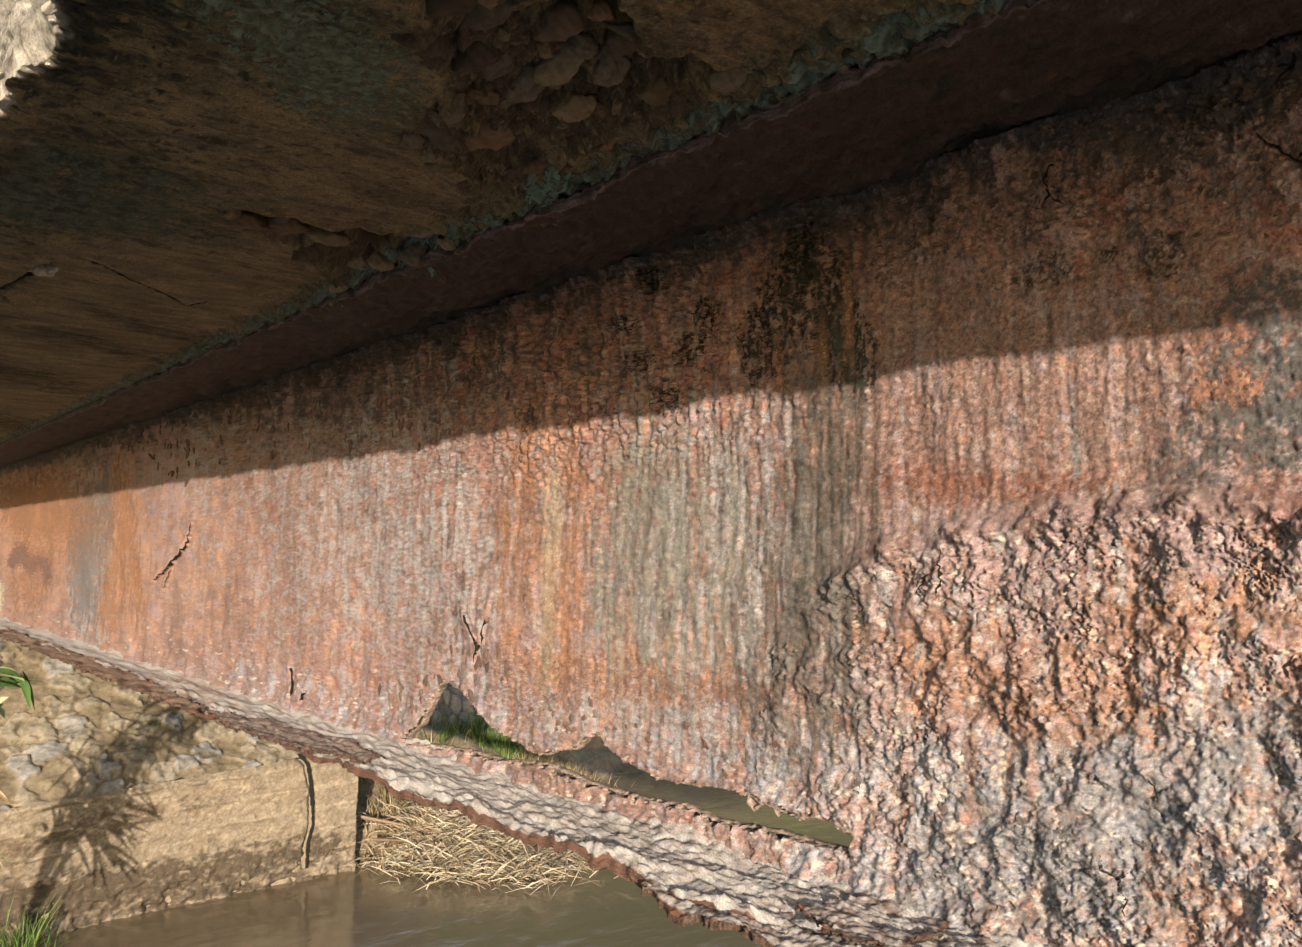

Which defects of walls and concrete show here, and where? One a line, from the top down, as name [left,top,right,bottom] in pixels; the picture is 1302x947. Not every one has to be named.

water stain [39,0,164,92]
spalling [391,0,689,202]
crack [1256,133,1302,163]
crack [0,257,230,316]
water stain [737,221,880,405]
rust [1184,322,1266,416]
crack [153,523,191,589]
rust [378,604,509,719]
rust [701,709,810,778]
crack [297,753,315,869]
rust [899,769,987,838]
rust [640,881,1001,947]